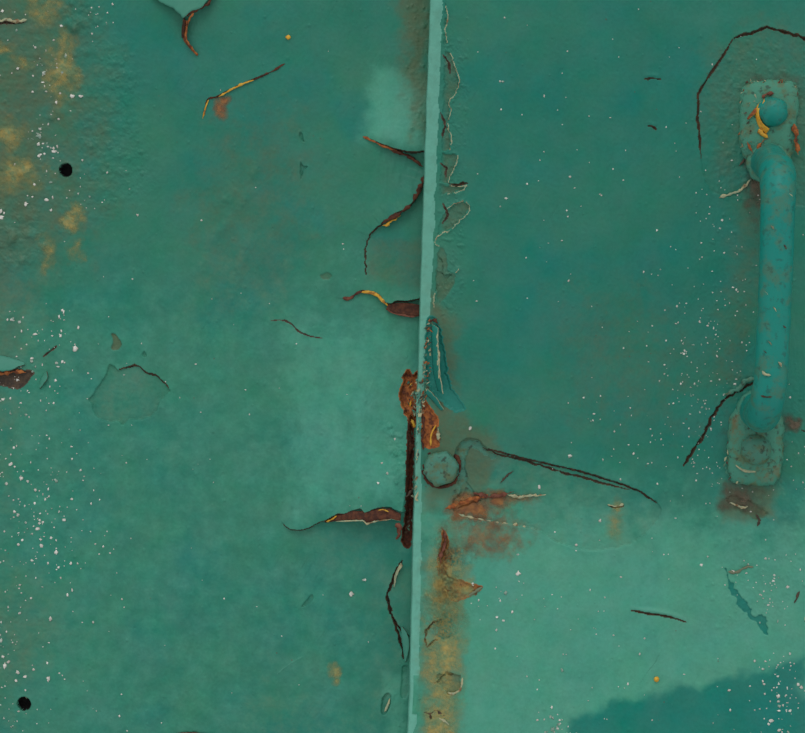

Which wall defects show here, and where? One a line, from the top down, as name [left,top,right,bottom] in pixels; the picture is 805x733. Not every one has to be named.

peeling [158,0,211,56]
rust [215,98,229,117]
peeling [180,48,285,119]
peeling [695,26,805,208]
peeling [282,0,472,539]
peeling [0,355,35,390]
peeling [88,350,172,427]
crack [683,371,771,466]
peeling [445,436,663,553]
rust [423,547,473,733]